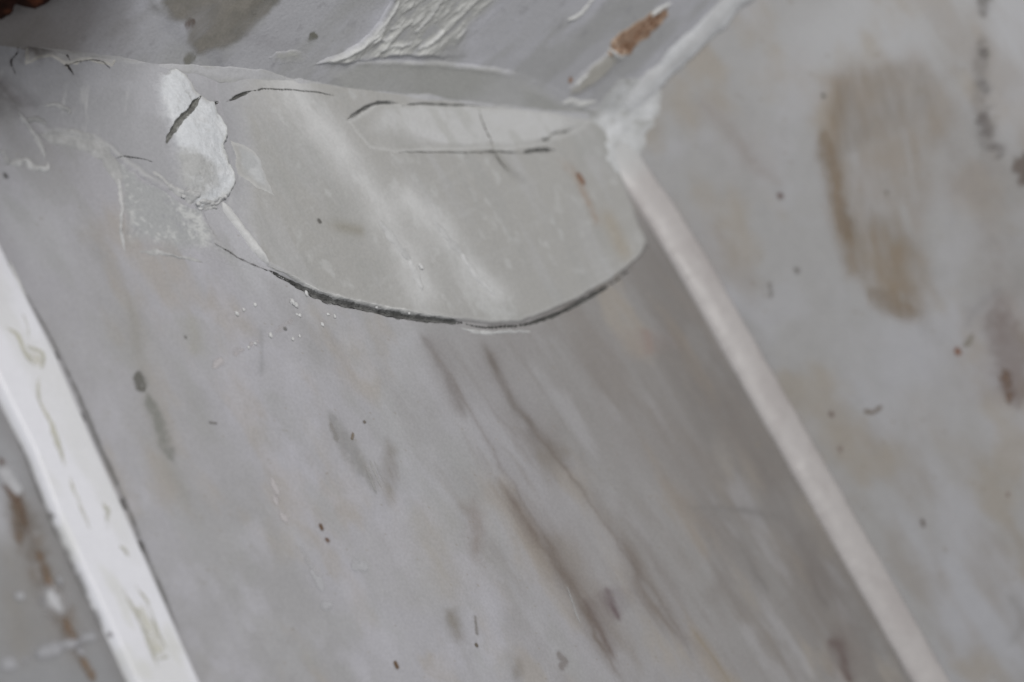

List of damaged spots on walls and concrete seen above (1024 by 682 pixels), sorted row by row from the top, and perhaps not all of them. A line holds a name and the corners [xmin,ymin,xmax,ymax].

peeling [314,0,510,65]
rust [608,3,671,59]
peeling [148,68,274,211]
crack [120,88,330,162]
crack [348,101,572,170]
crack [216,244,631,328]